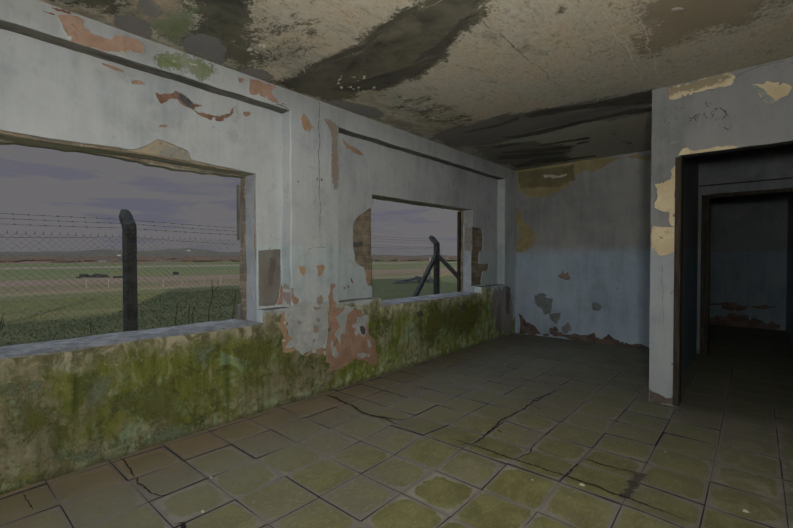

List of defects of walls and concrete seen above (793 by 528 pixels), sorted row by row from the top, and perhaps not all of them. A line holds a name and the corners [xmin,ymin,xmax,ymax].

water stain [50,0,138,17]
peeling [55,13,152,56]
water stain [632,0,791,58]
peeling [130,79,251,123]
water stain [151,0,654,168]
peeling [667,72,737,101]
peeling [516,154,651,198]
peeling [651,145,739,257]
flaking render [353,208,371,286]
peeling [258,249,378,372]
peeling [518,293,649,350]
crack [452,389,687,521]